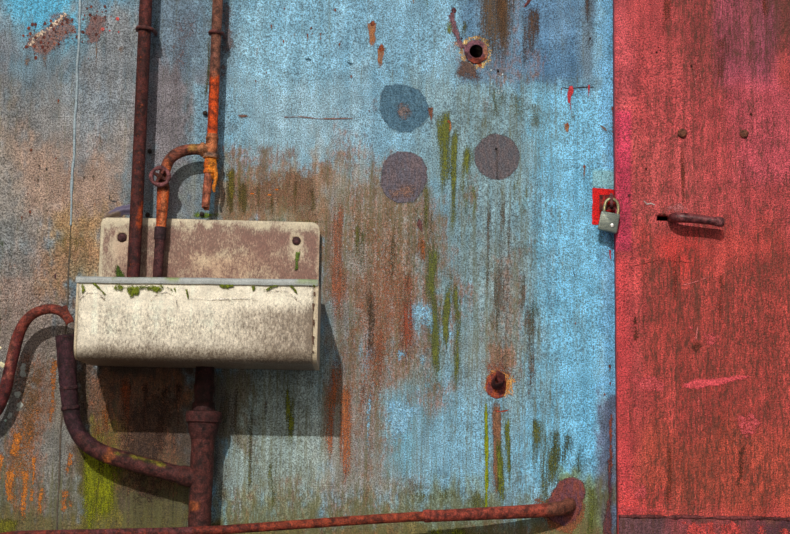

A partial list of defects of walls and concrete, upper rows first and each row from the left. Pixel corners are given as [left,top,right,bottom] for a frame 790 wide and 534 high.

peeling [22,5,119,66]
corrosion [448,0,540,80]
corrosion [227,168,316,215]
corrosion [325,195,426,482]
corrosion [0,359,58,516]
corrosion [95,381,181,461]
corrosion [484,361,518,495]
corrosion [535,476,586,534]
corrosion [603,414,613,534]